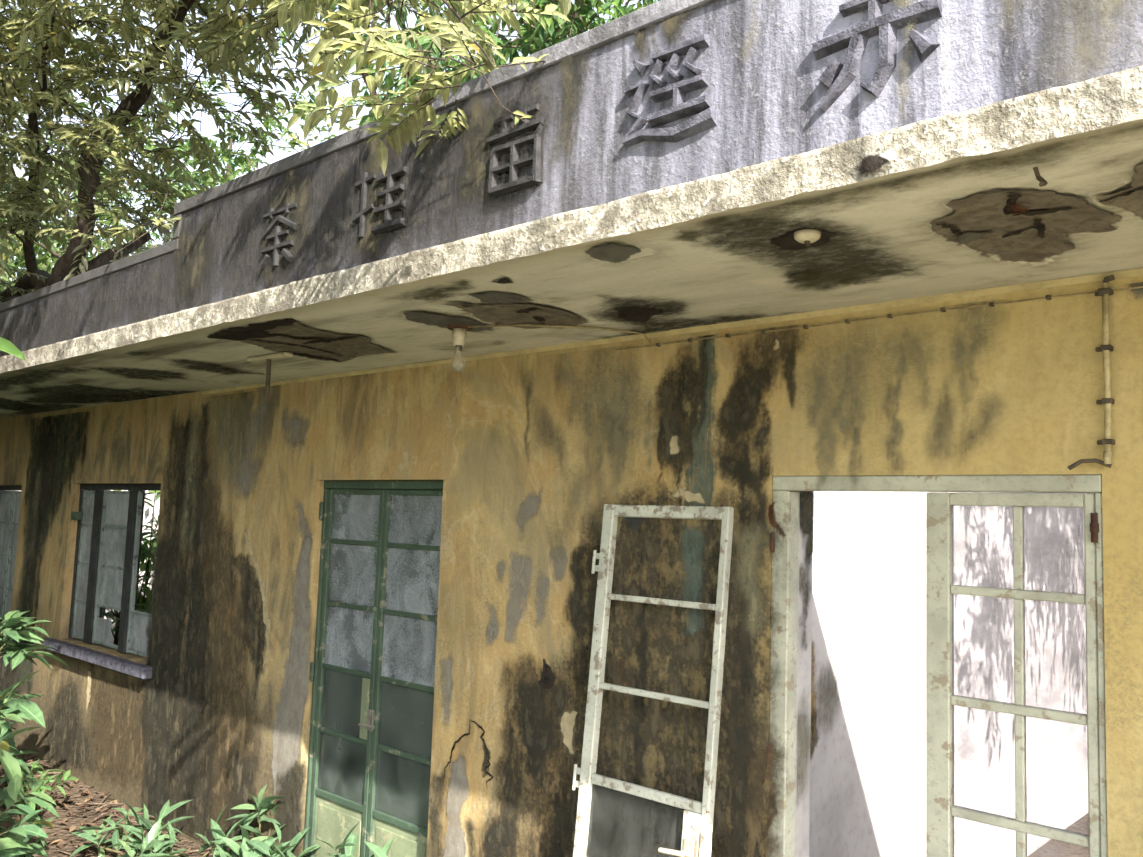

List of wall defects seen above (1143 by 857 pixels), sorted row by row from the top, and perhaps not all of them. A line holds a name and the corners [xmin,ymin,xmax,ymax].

spalling [208,319,396,363]
spalling [404,278,588,332]
leakage [704,216,917,290]
spalling [930,164,1143,262]
leakage [800,342,908,616]
leakage [0,352,260,857]
crack [444,719,493,785]
leakage [479,479,602,857]
leakage [556,296,804,857]
leakage [797,632,837,789]